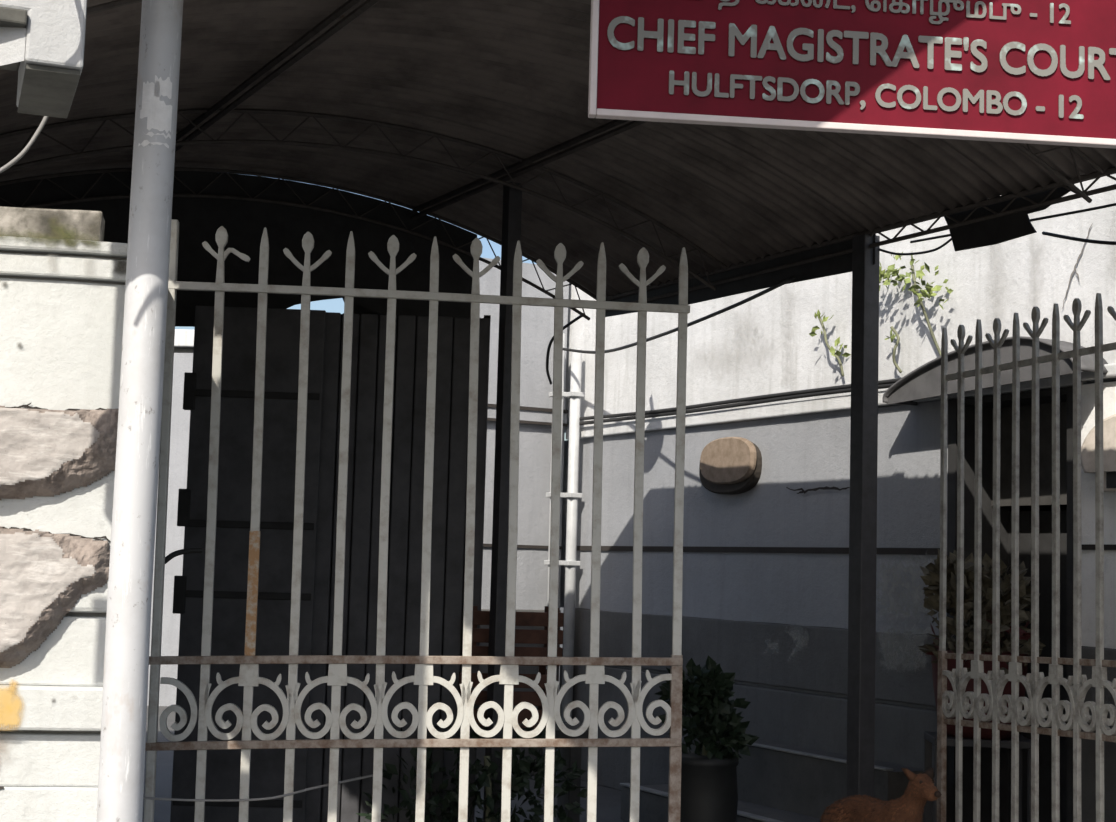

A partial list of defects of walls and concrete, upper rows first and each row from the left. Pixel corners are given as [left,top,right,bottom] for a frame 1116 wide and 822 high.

crack [786,486,850,494]